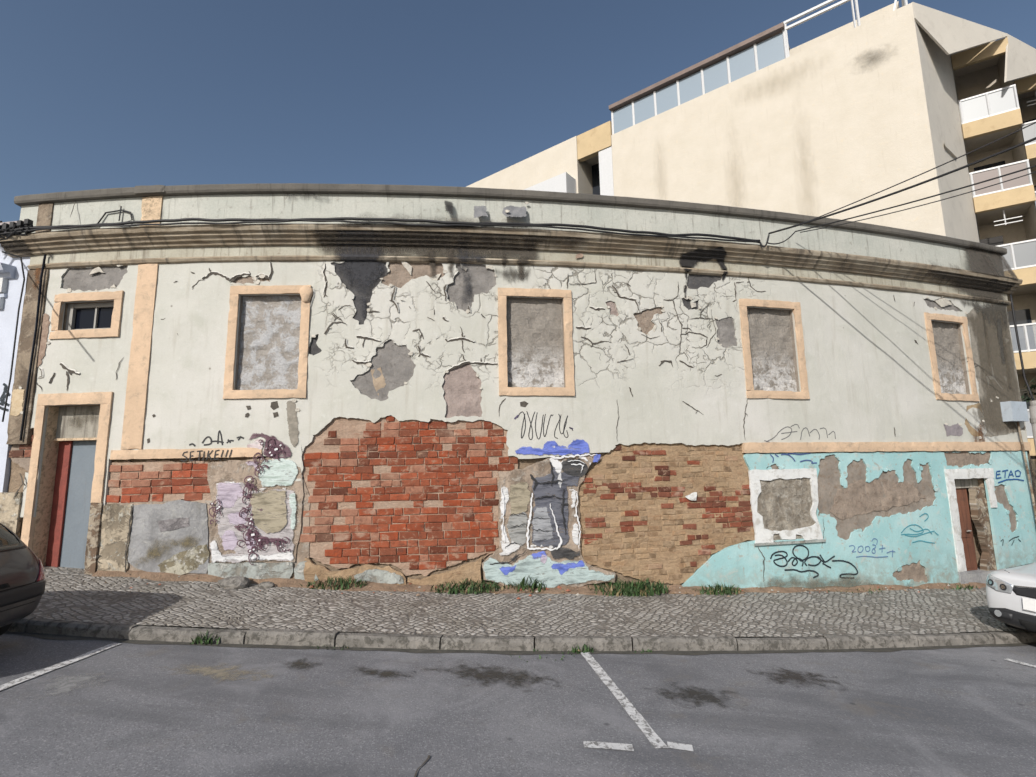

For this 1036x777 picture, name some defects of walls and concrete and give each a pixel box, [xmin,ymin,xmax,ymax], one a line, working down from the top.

crack [173,262,273,288]
spalling [351,340,416,401]
crack [310,263,497,371]
spalling [331,262,497,325]
water stain [316,201,585,279]
crack [567,274,764,376]
spalling [682,262,722,310]
water stain [929,244,1019,432]
spalling [106,460,212,503]
spalling [286,363,518,576]
spalling [578,443,755,585]
spalling [817,454,939,540]